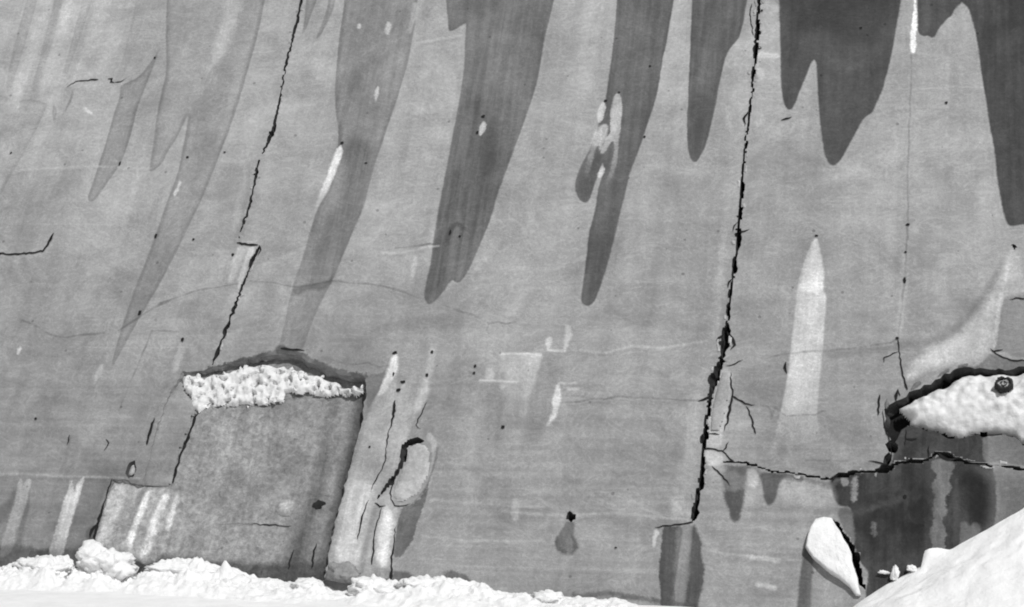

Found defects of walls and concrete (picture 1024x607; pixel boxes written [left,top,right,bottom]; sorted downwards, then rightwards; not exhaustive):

crack [0,233,54,255]
crack [172,414,198,484]
crack [17,0,426,365]
spalling [92,354,367,555]
damp [0,0,557,388]
damp [0,320,584,582]
crack [357,401,441,580]
crack [557,0,1024,528]
damp [567,0,1024,607]
spalling [883,363,1024,469]